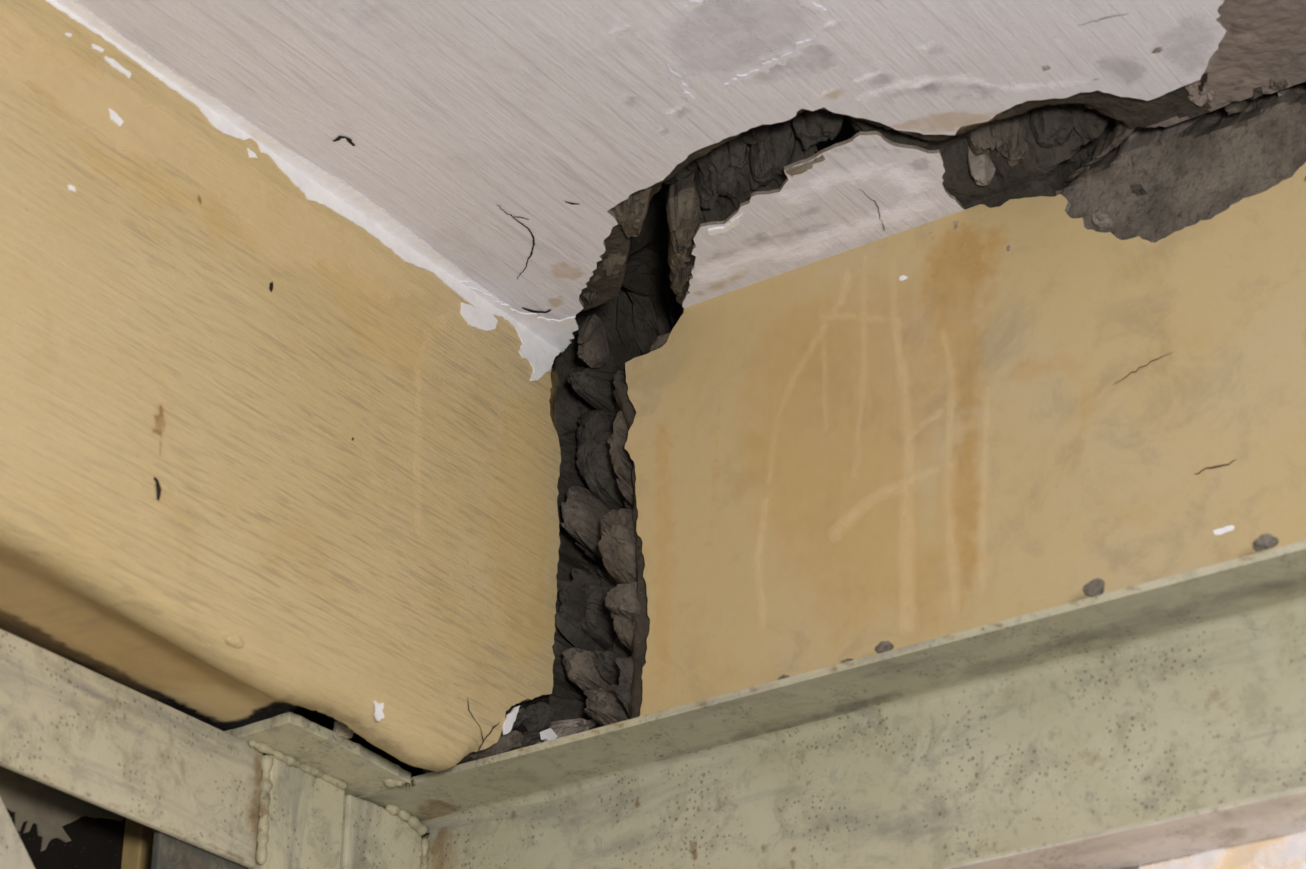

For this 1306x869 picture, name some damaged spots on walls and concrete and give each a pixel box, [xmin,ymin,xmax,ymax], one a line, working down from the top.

peeling [45,0,578,381]
flaking render [1056,0,1306,243]
crack [498,78,1288,730]